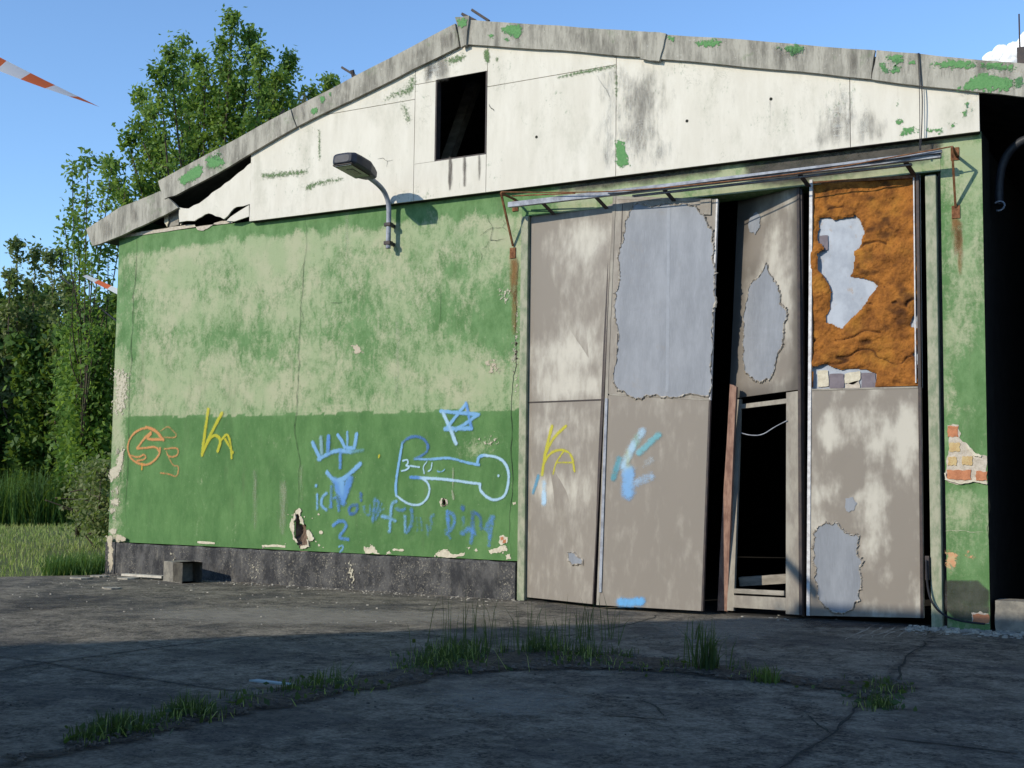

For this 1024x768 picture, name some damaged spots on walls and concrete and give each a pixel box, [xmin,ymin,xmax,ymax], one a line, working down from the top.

water stain [448,157,466,189]
peeling [614,204,715,398]
peeling [743,265,786,381]
flaking render [110,366,131,416]
spalling [944,424,988,485]
flaking render [106,446,126,573]
spalling [262,508,324,552]
flaking render [364,544,404,555]
flaking render [434,535,511,560]
peeling [813,523,861,612]
crack [780,636,933,768]